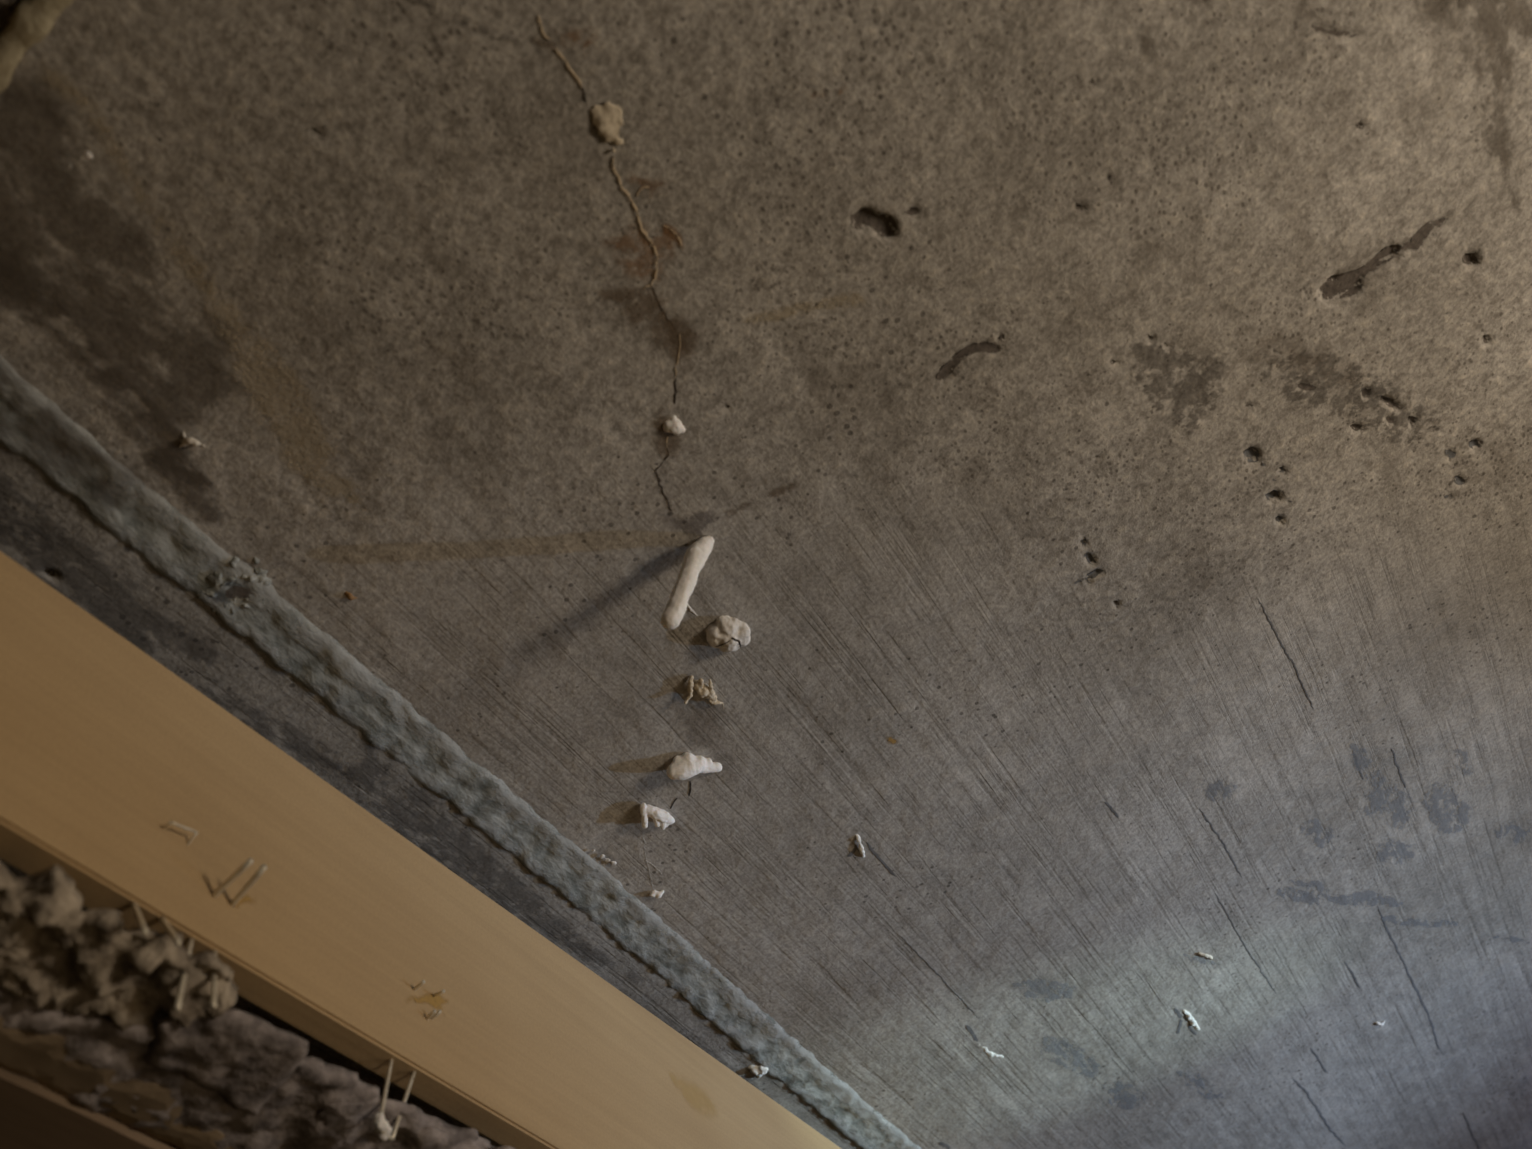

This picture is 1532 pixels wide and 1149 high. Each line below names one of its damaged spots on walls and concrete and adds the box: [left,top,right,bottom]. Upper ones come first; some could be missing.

crack [611,156,682,512]